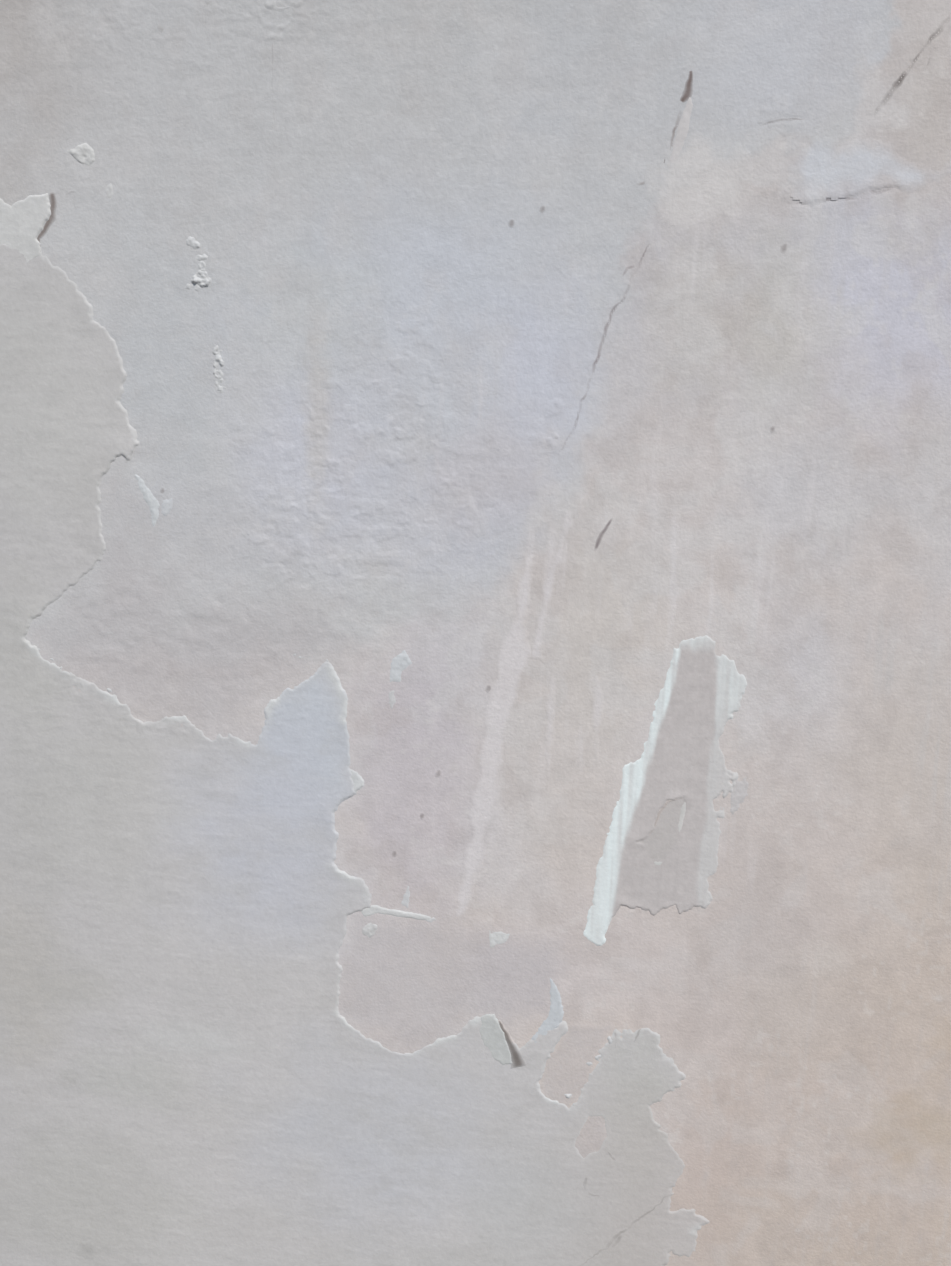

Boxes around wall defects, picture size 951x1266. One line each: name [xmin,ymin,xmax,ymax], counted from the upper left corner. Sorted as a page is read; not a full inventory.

crack [874,13,951,116]
crack [636,71,693,200]
crack [793,188,893,205]
crack [558,229,654,453]
peeling [540,1022,615,1108]